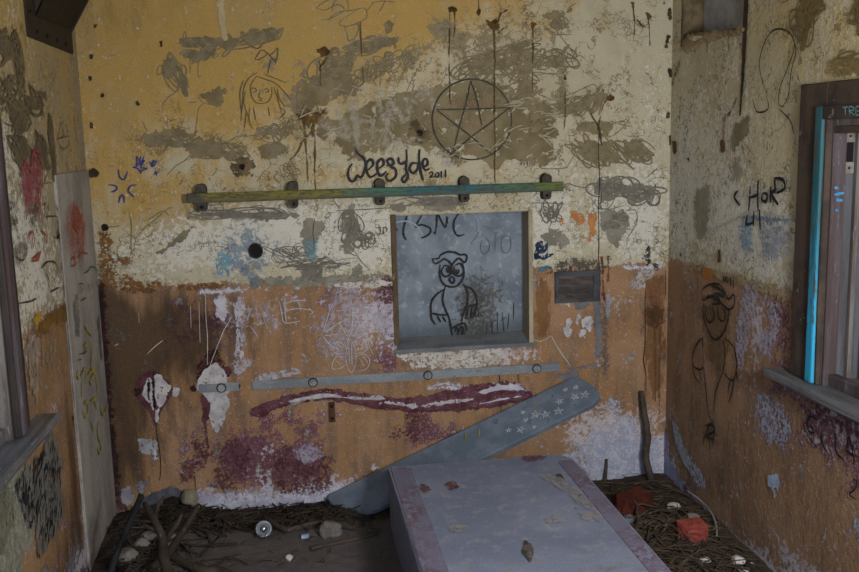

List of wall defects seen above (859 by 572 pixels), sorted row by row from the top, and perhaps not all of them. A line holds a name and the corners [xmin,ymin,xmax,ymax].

rust [448,6,457,101]
rust [476,0,508,181]
peeling [292,62,654,249]
flaking render [116,204,503,511]
peeling [688,263,793,370]
flaking render [0,430,64,572]
peeling [64,540,89,572]
damp [562,395,709,512]
peeling [749,393,791,450]
peeling [767,473,780,499]